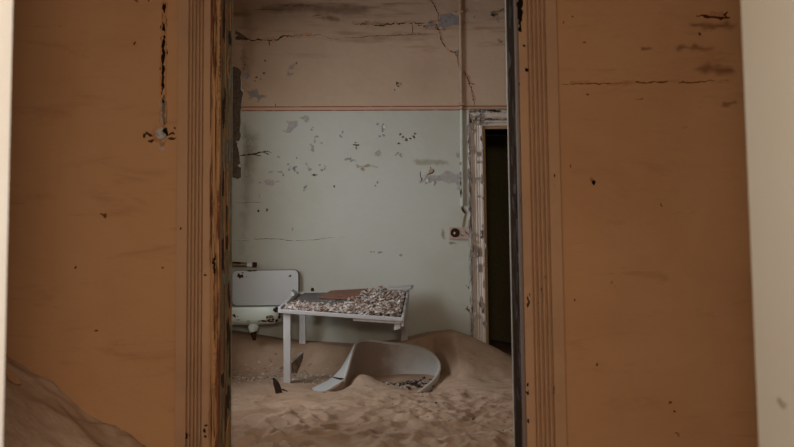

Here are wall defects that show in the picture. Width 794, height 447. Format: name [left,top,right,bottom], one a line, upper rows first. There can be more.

crack [158,0,168,125]
crack [239,0,476,104]
crack [563,78,730,86]
crack [696,10,729,20]
peeling [199,0,267,447]
spalling [419,166,484,214]
peeling [466,38,539,447]